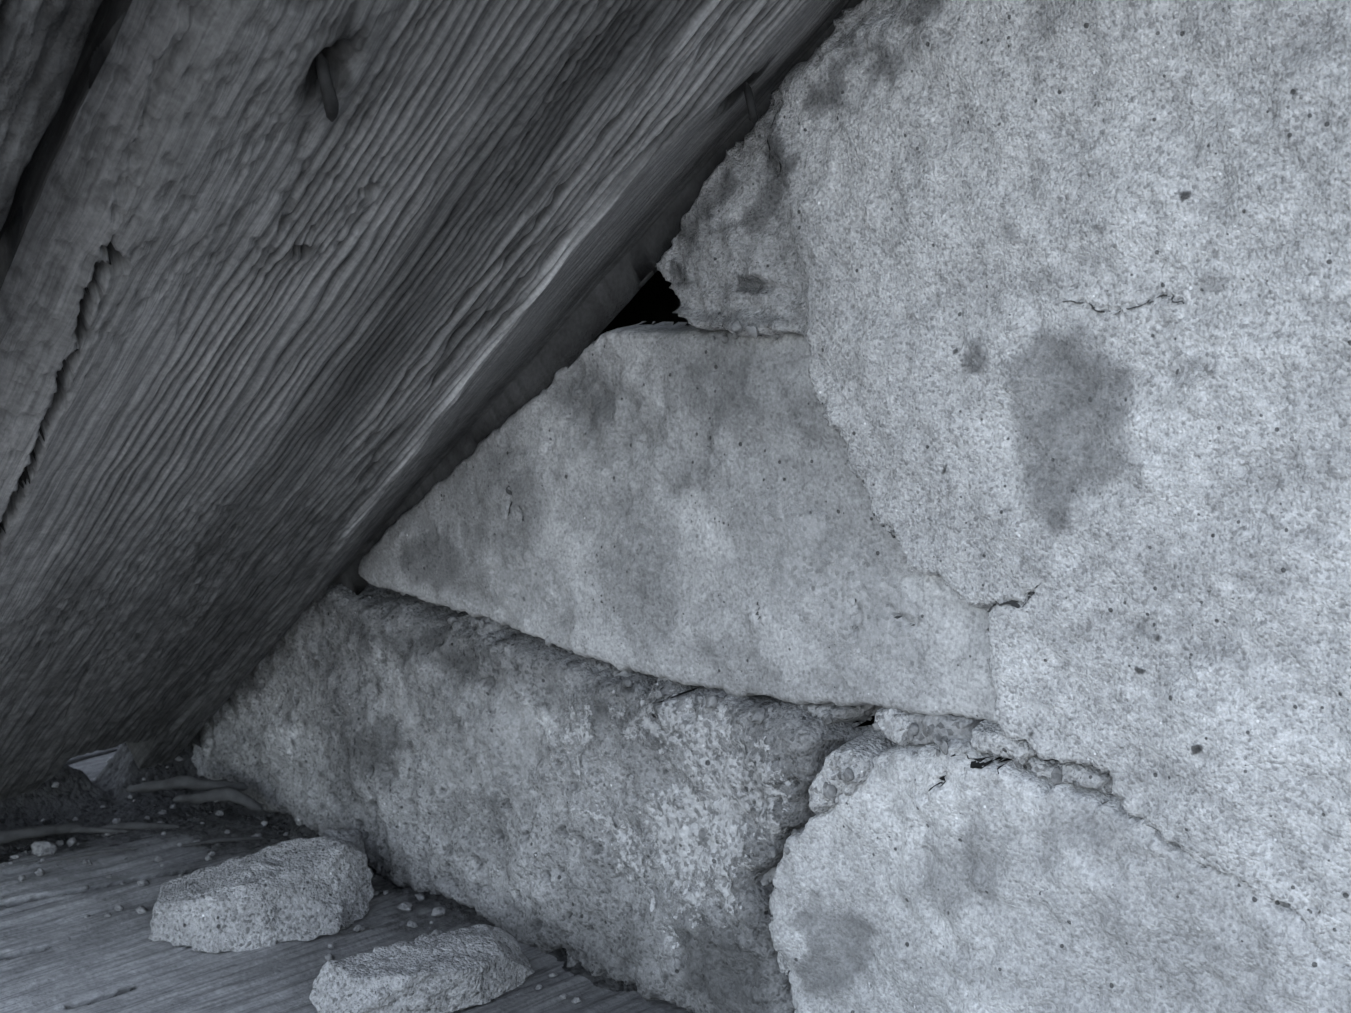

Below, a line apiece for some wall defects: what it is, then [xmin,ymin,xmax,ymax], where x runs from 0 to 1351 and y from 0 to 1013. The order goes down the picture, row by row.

crack [928,754,1082,791]